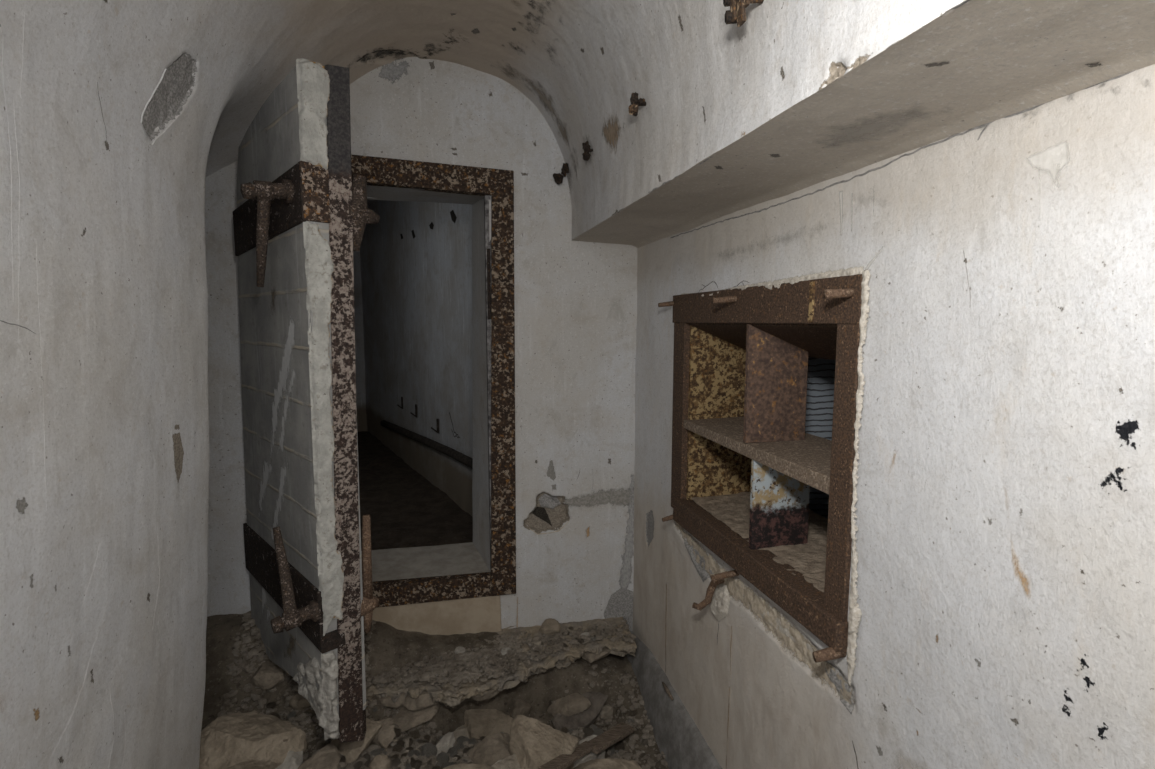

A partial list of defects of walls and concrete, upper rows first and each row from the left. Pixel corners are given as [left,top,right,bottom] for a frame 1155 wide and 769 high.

flaking render [141,53,197,145]
spalling [523,460,570,535]
flaking render [675,266,871,714]